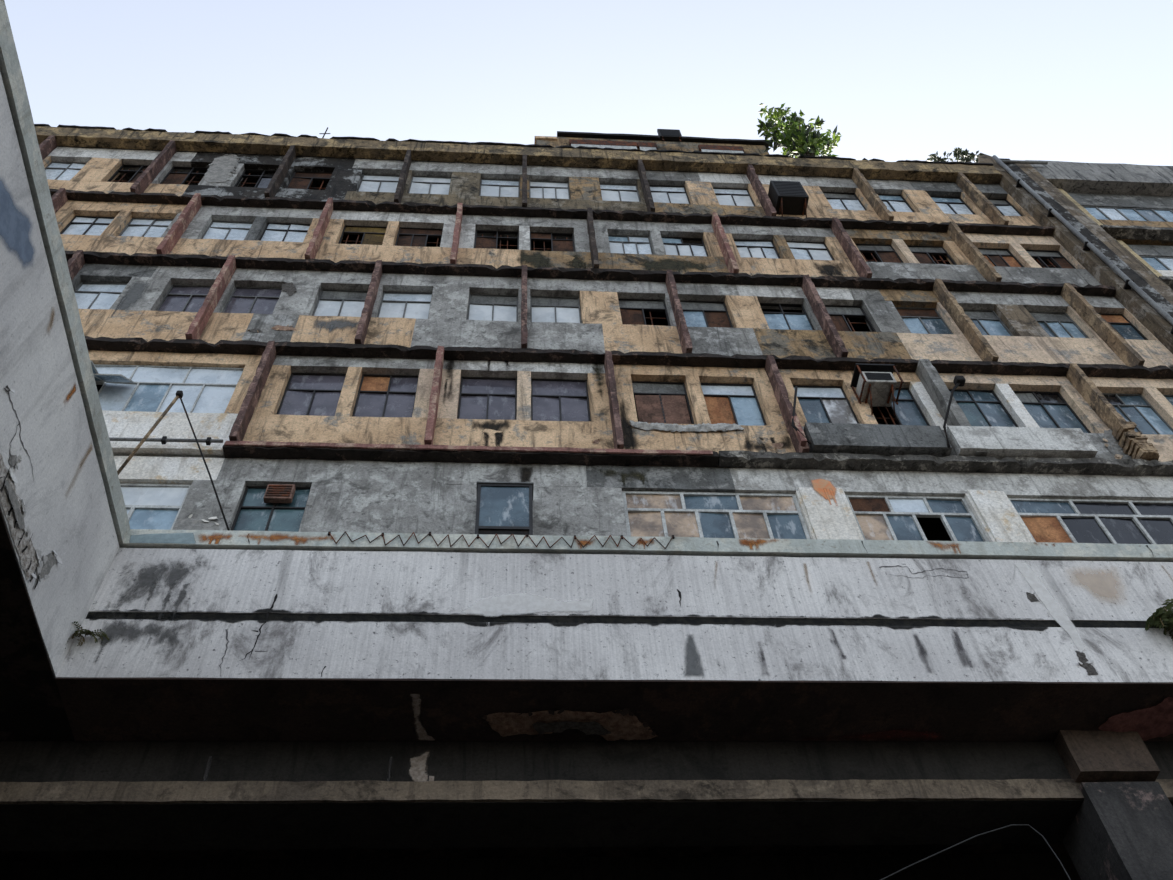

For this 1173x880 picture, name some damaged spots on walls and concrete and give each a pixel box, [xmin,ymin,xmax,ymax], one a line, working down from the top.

damp [0,180,34,265]
crack [7,385,34,477]
damp [473,421,509,446]
spalling [0,447,63,590]
corrosion [201,534,231,544]
corrosion [246,534,332,545]
damp [90,562,327,662]
crack [219,594,277,675]
spalling [482,708,663,741]
spalling [1098,697,1173,741]